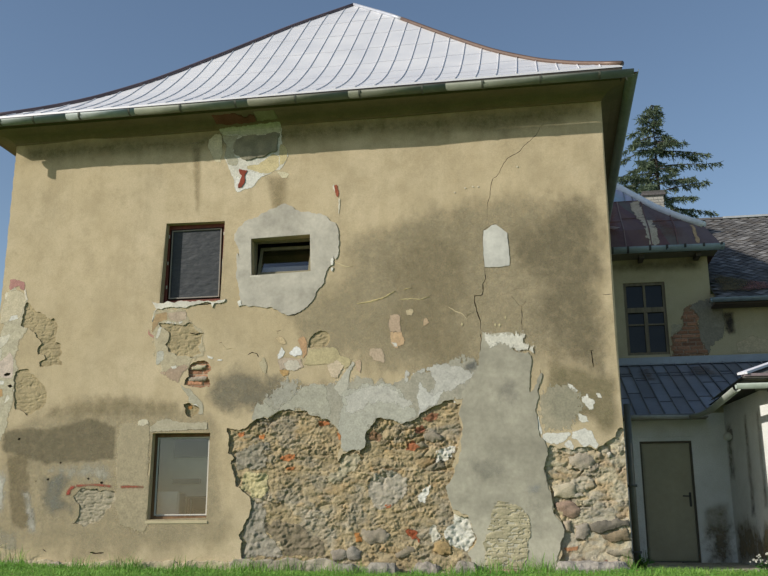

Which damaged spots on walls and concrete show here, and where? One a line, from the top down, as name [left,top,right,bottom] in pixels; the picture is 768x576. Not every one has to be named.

flaking render [208,110,289,192]
crack [484,128,540,230]
flaking render [0,279,62,440]
water stain [0,408,205,550]
flaking render [148,299,226,417]
flaking render [0,331,479,575]
water stain [212,375,280,411]
water stain [302,199,595,369]
crack [474,250,486,350]
water stain [550,369,613,427]
flaking render [538,383,634,565]
water stain [708,508,768,564]